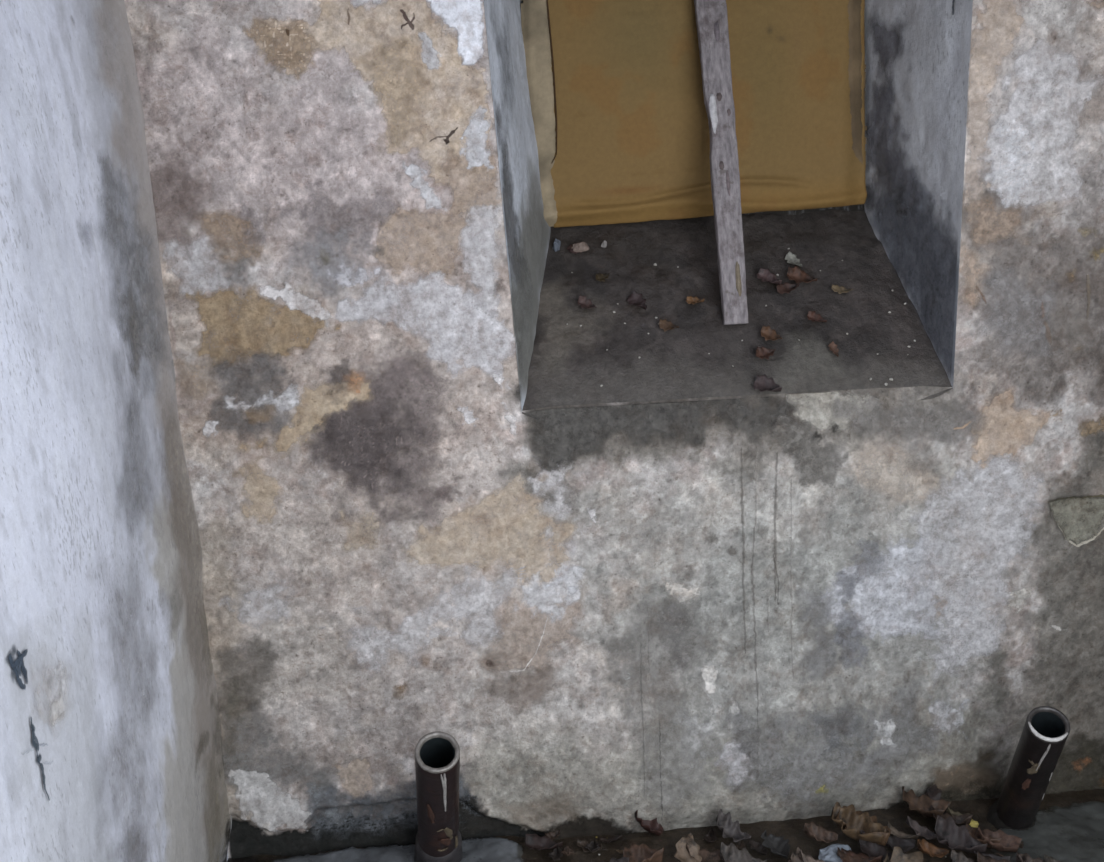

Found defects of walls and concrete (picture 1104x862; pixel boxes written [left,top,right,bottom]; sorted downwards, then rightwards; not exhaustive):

peeling [166,0,516,395]
leakage [314,358,449,516]
spalling [458,408,475,424]
leakage [522,397,1042,679]
spalling [1048,494,1104,547]
crack [7,647,28,689]
crack [30,717,50,800]
spalling [223,759,418,862]
spalling [459,776,546,840]